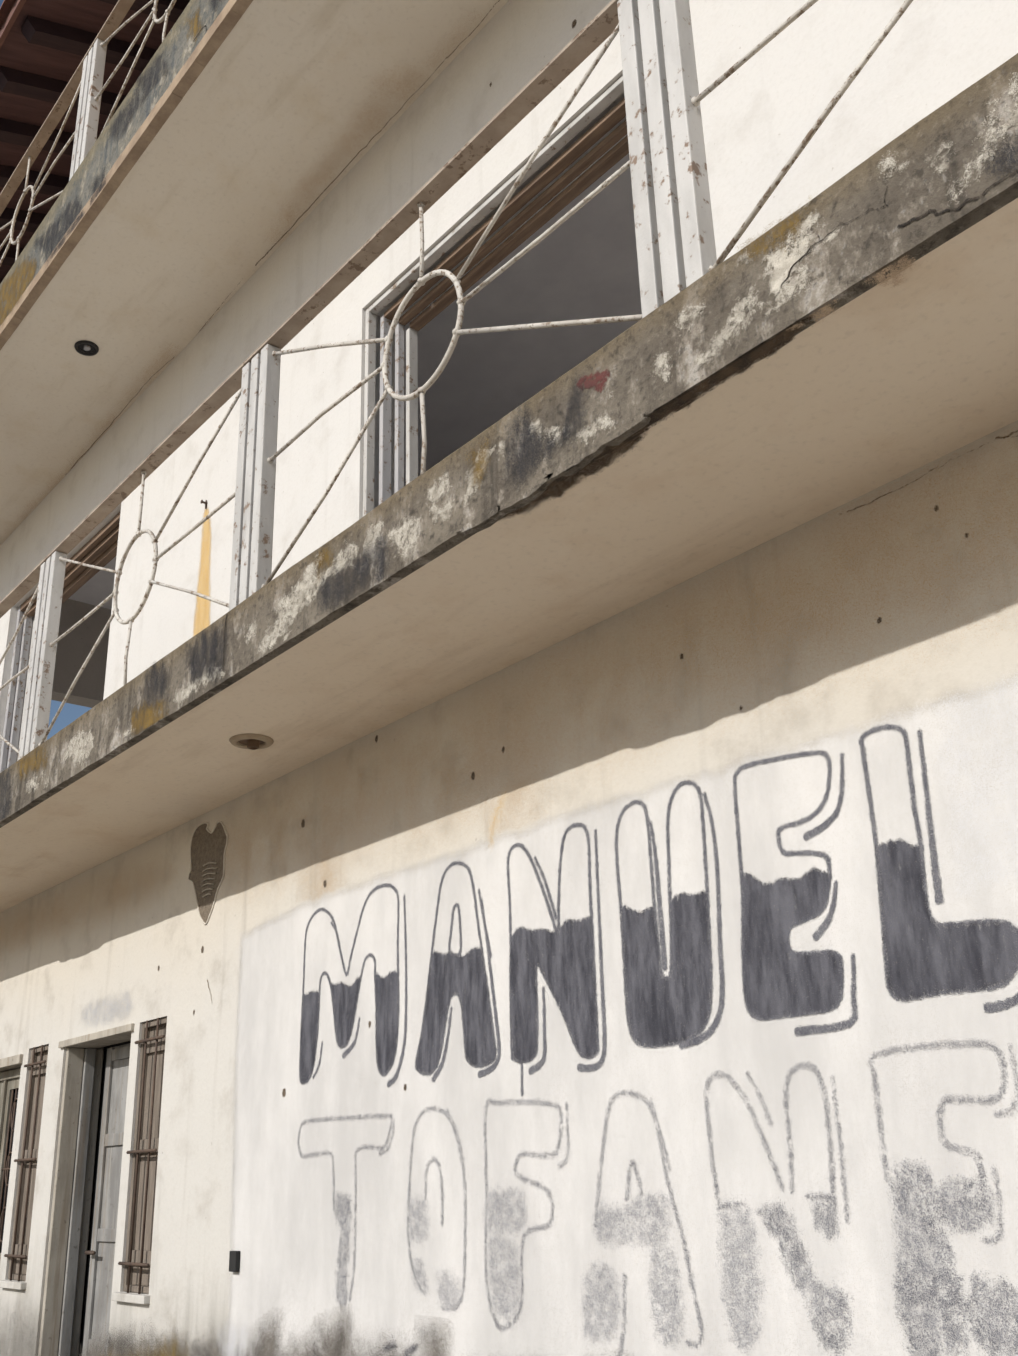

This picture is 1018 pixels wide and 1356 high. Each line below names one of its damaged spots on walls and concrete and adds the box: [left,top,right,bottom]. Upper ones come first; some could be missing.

water stain [106,53,170,145]
peeling [876,151,909,180]
peeling [925,72,1018,207]
water stain [34,165,109,266]
peeling [676,299,705,336]
peeling [694,193,845,370]
peeling [652,351,672,381]
water stain [500,373,587,497]
peeling [528,383,617,446]
water stain [316,532,393,612]
water stain [142,617,228,710]
water stain [77,1304,542,1356]